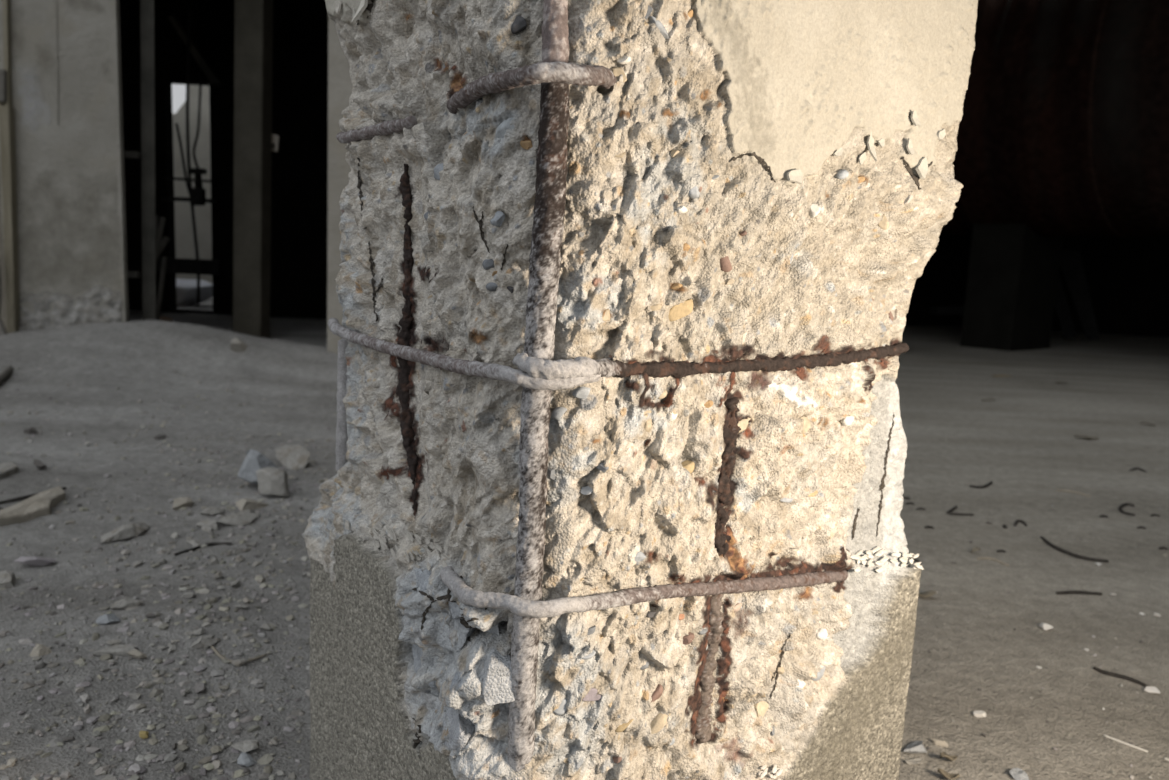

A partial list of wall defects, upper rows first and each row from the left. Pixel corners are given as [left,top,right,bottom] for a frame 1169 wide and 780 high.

rust [435,58,466,97]
rust [378,261,449,519]
spalling [302,0,963,780]
rust [625,335,901,760]
crack [852,415,895,540]